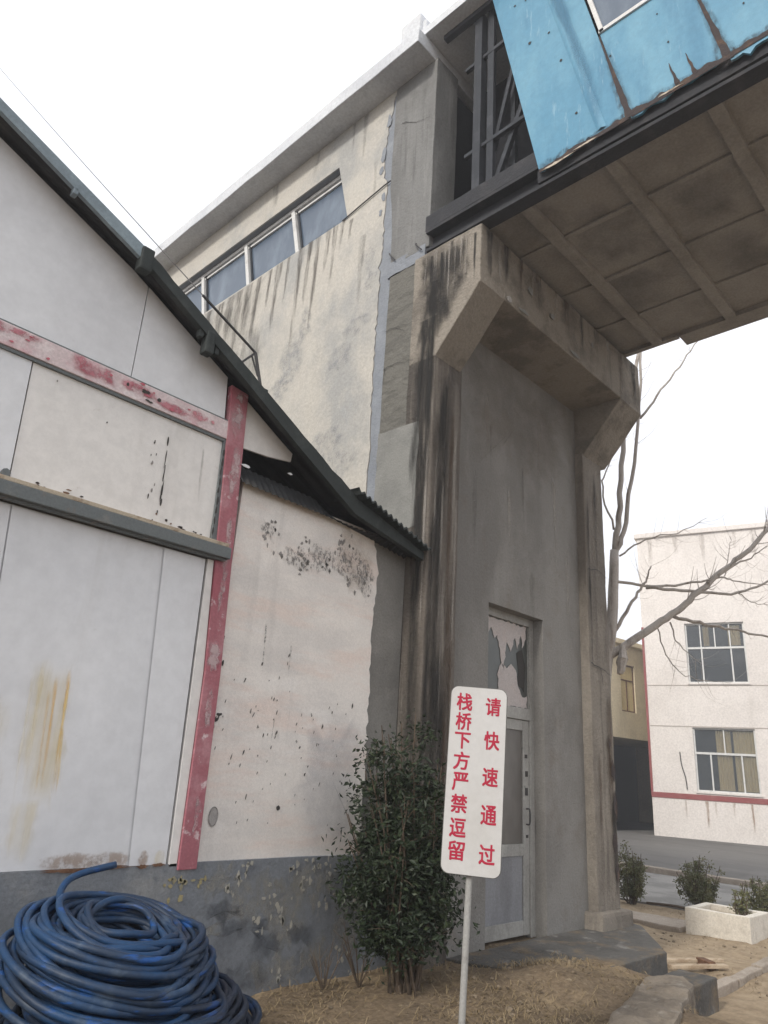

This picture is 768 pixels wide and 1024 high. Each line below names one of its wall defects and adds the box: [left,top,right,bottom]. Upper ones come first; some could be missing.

corrosion [539,30,768,173]
damp [207,241,318,323]
peeling [0,321,37,342]
peeling [77,356,215,424]
peeling [147,437,169,513]
peeling [212,450,240,538]
damp [407,229,523,798]
peeling [208,635,225,668]
flaking render [262,520,405,854]
peeling [252,856,347,935]